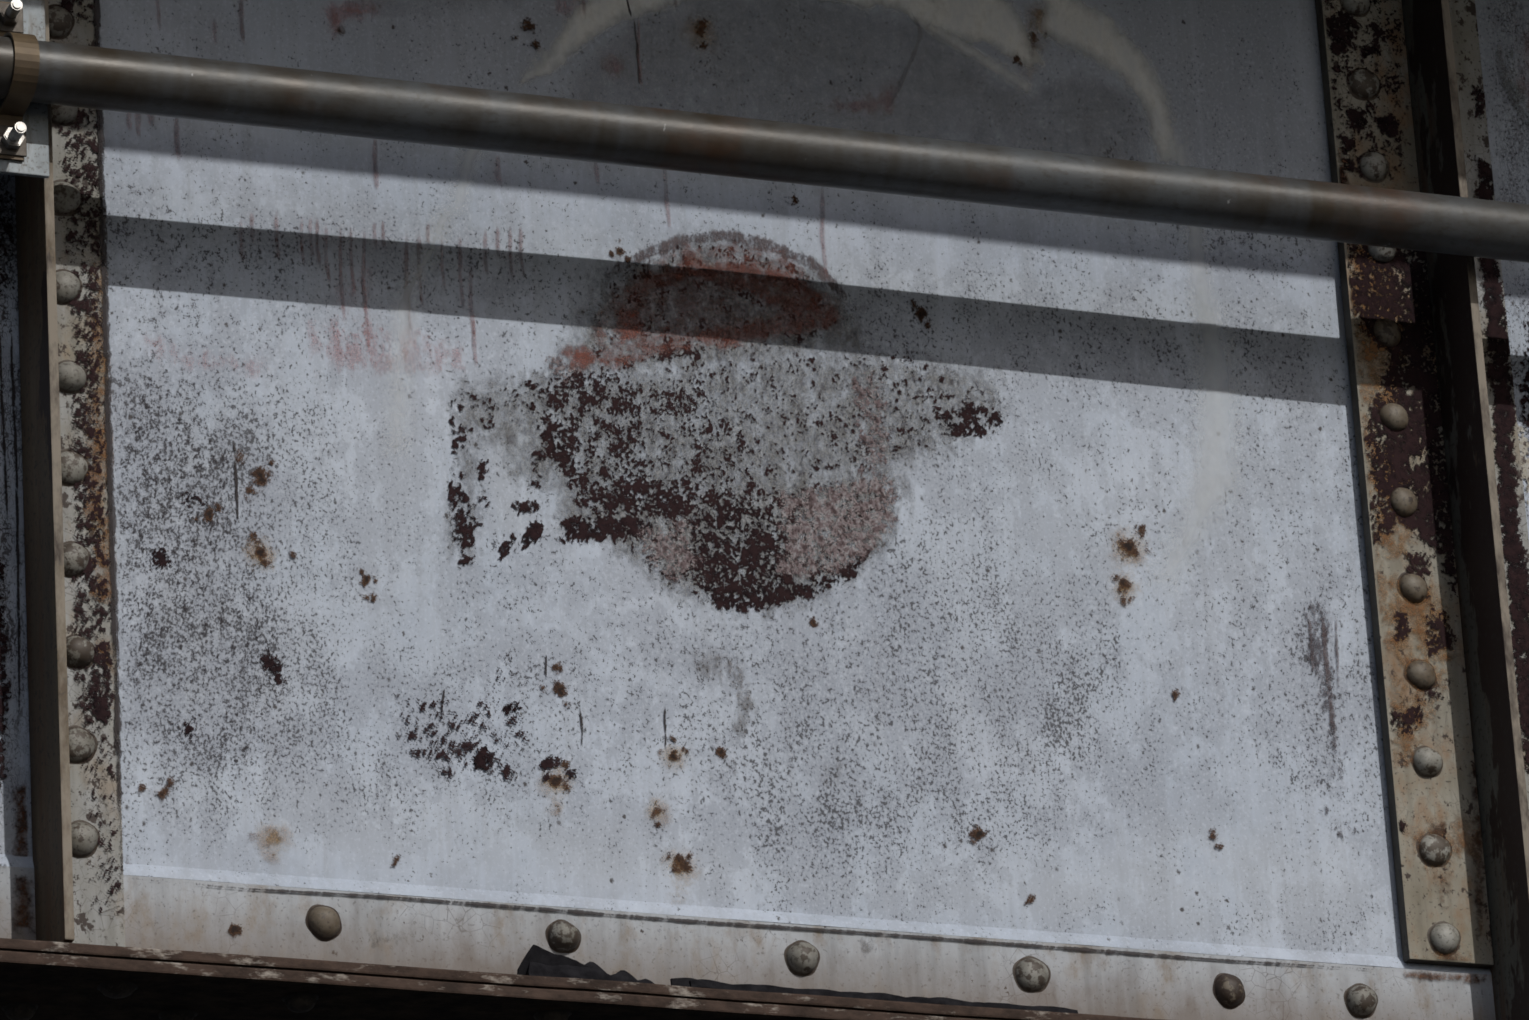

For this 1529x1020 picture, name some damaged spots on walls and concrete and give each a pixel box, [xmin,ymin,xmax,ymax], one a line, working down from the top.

rust [609,239,631,264]
rust [910,300,931,329]
rust [1350,244,1403,403]
rust [86,323,114,602]
rust [1118,524,1152,557]
rust [1111,574,1135,606]
rust [1379,575,1450,688]
rust [539,661,570,708]
rust [548,759,571,794]
rust [1415,770,1485,917]